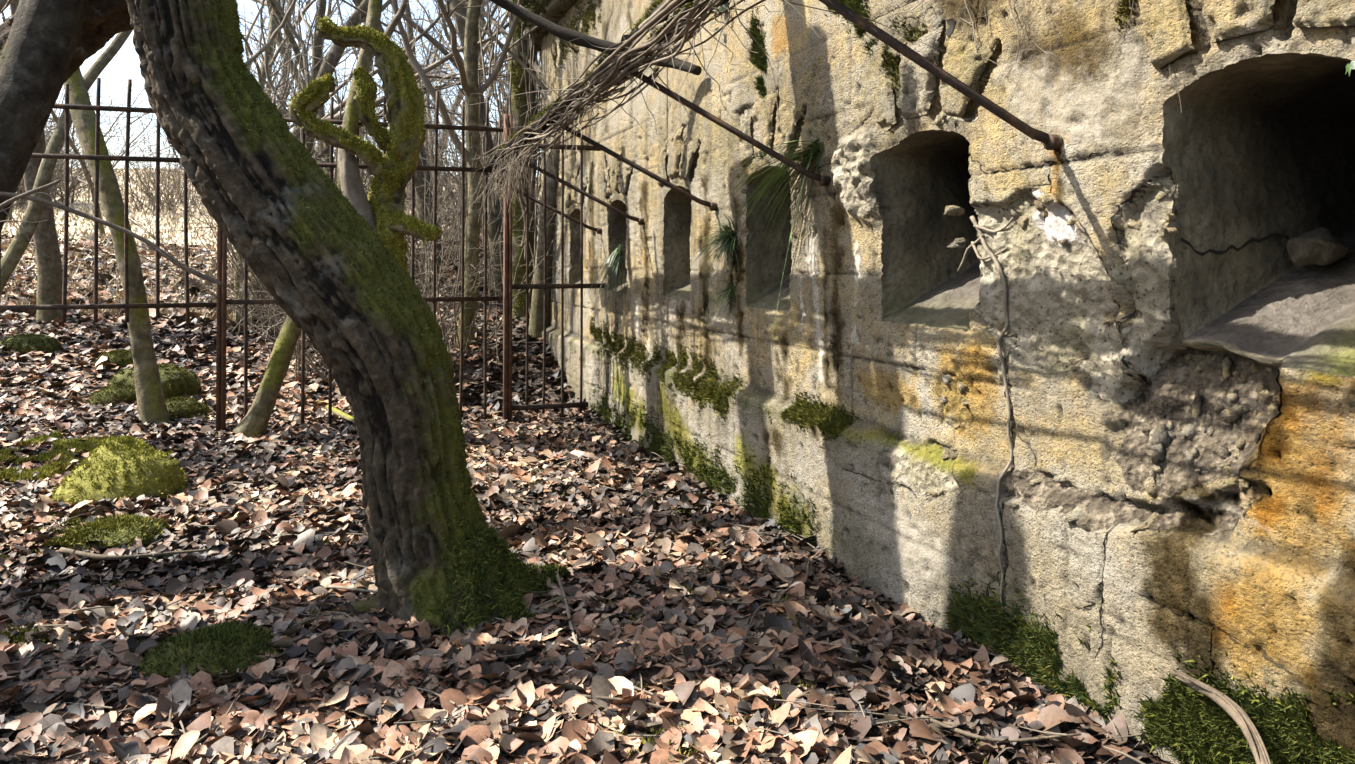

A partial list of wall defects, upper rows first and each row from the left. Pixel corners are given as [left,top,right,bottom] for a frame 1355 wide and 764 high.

crack [987,345,1134,658]
spalling [943,176,1280,536]
crack [1141,595,1293,674]
damp [1305,545,1355,763]